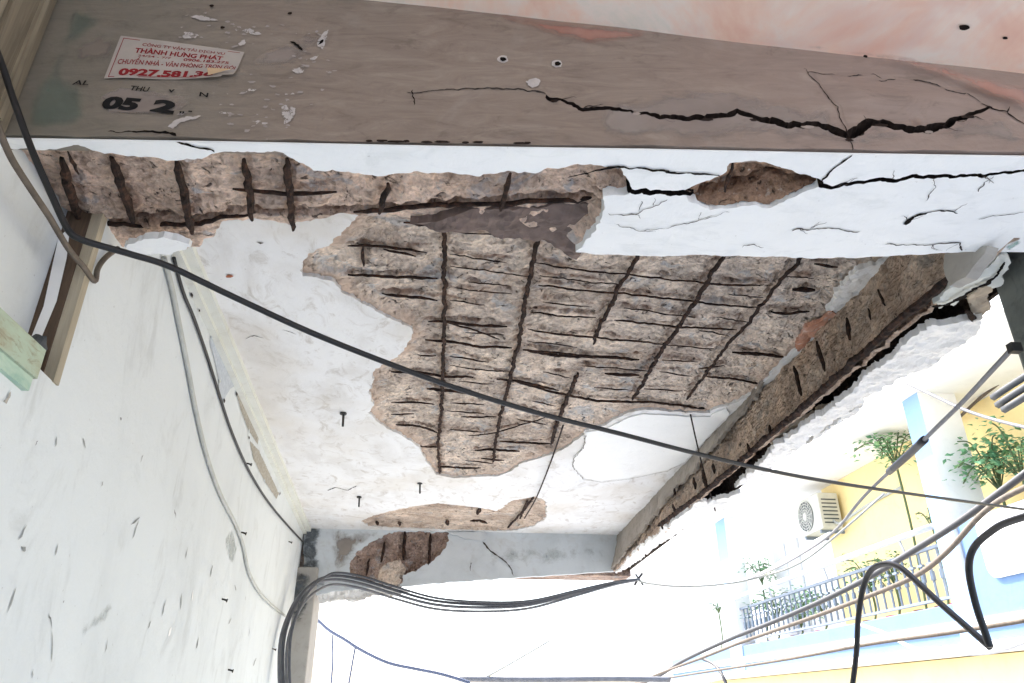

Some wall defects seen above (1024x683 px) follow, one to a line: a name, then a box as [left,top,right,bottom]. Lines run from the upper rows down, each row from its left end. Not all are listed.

crack [408,68,1024,251]
spalling [22,150,1020,573]
spalling [317,497,547,604]
crack [483,542,514,576]